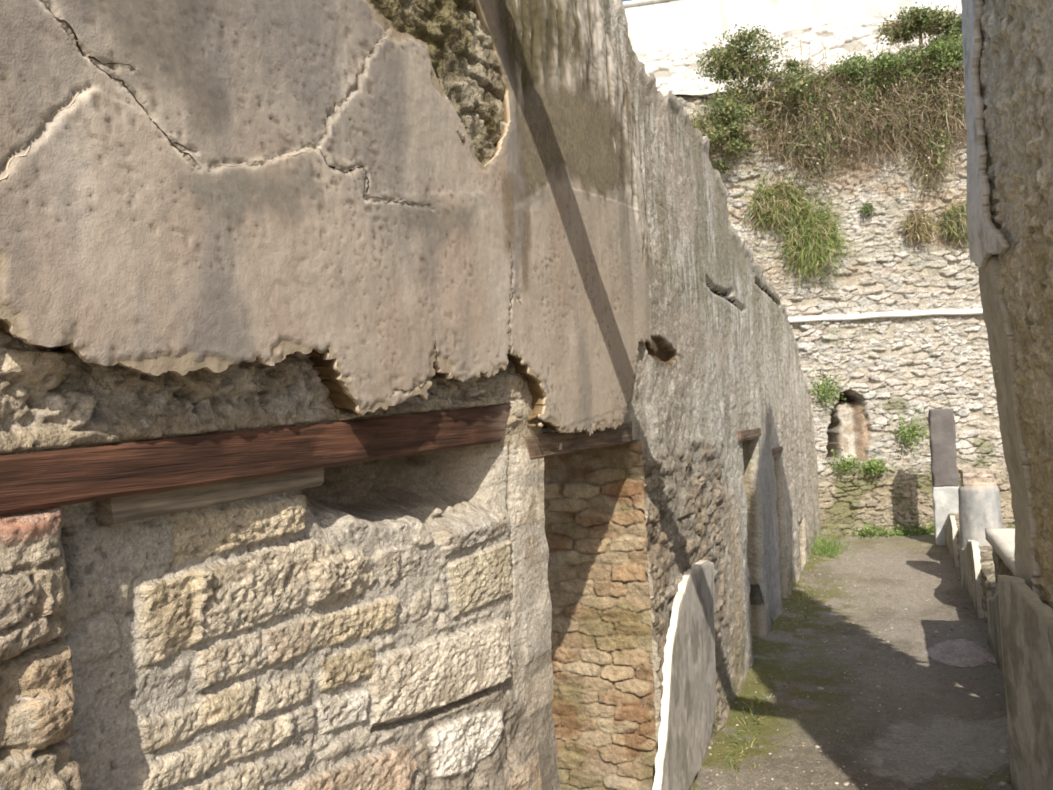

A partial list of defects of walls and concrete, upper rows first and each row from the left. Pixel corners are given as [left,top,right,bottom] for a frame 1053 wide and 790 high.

crack [0,0,432,206]